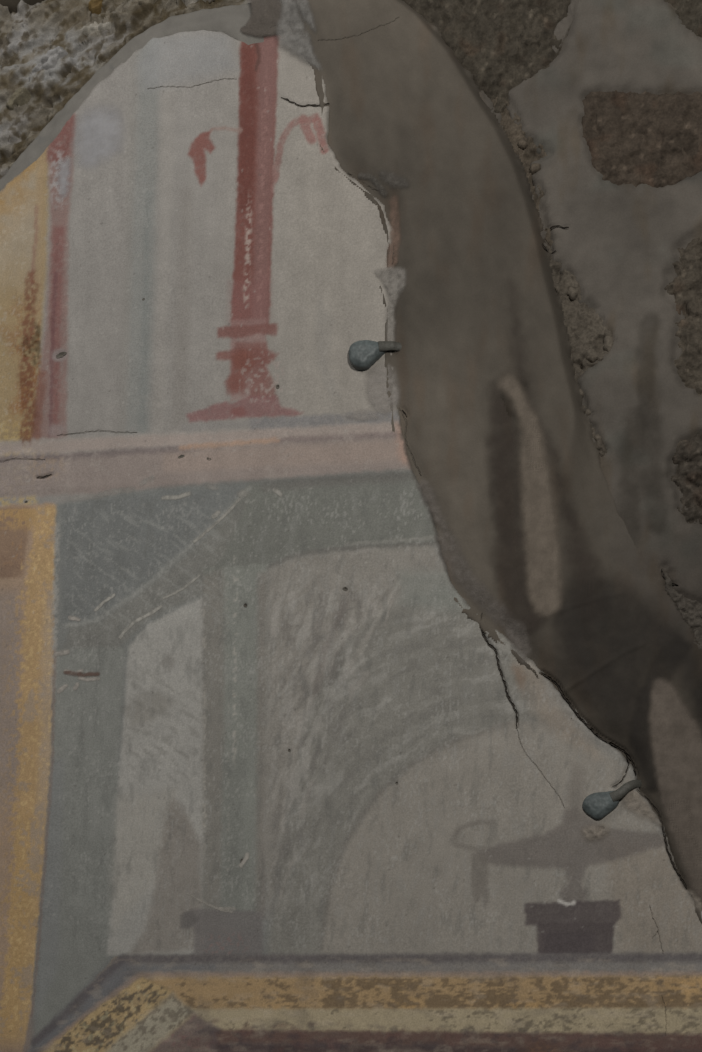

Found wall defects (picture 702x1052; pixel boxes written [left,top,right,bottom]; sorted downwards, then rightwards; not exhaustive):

spalling [0,0,251,179]
flaking render [278,0,320,67]
crack [281,97,329,107]
flaking render [376,268,405,341]
spalling [544,240,614,416]
crack [480,614,562,801]